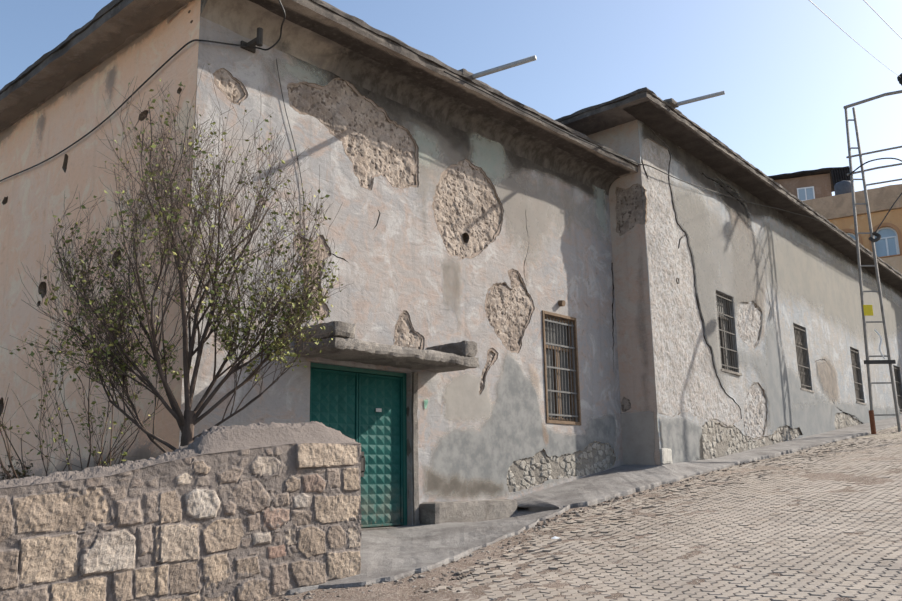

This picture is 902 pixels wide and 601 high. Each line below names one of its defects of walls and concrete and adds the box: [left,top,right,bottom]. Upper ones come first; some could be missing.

spalling [213,68,248,105]
spalling [287,78,419,191]
spalling [432,159,504,259]
spalling [394,310,425,350]
spalling [479,269,535,395]
flaking render [615,138,767,441]
crack [641,149,742,419]
leakage [426,470,503,498]